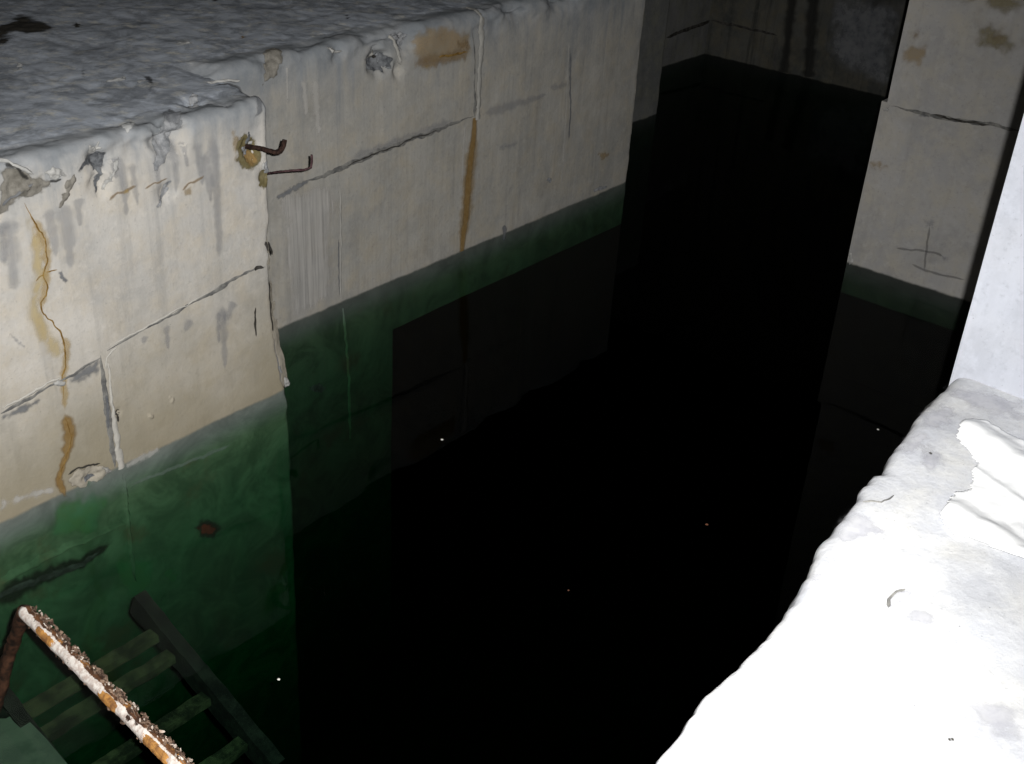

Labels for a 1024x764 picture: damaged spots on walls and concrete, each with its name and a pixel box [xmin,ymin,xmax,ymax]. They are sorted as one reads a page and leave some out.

crack [894,106,1019,131]
spalling [0,158,76,214]
rust [233,132,269,188]
crack [277,116,473,198]
rust [460,118,476,252]
crack [1,205,264,494]
spalling [68,463,112,488]
crack [0,545,107,603]